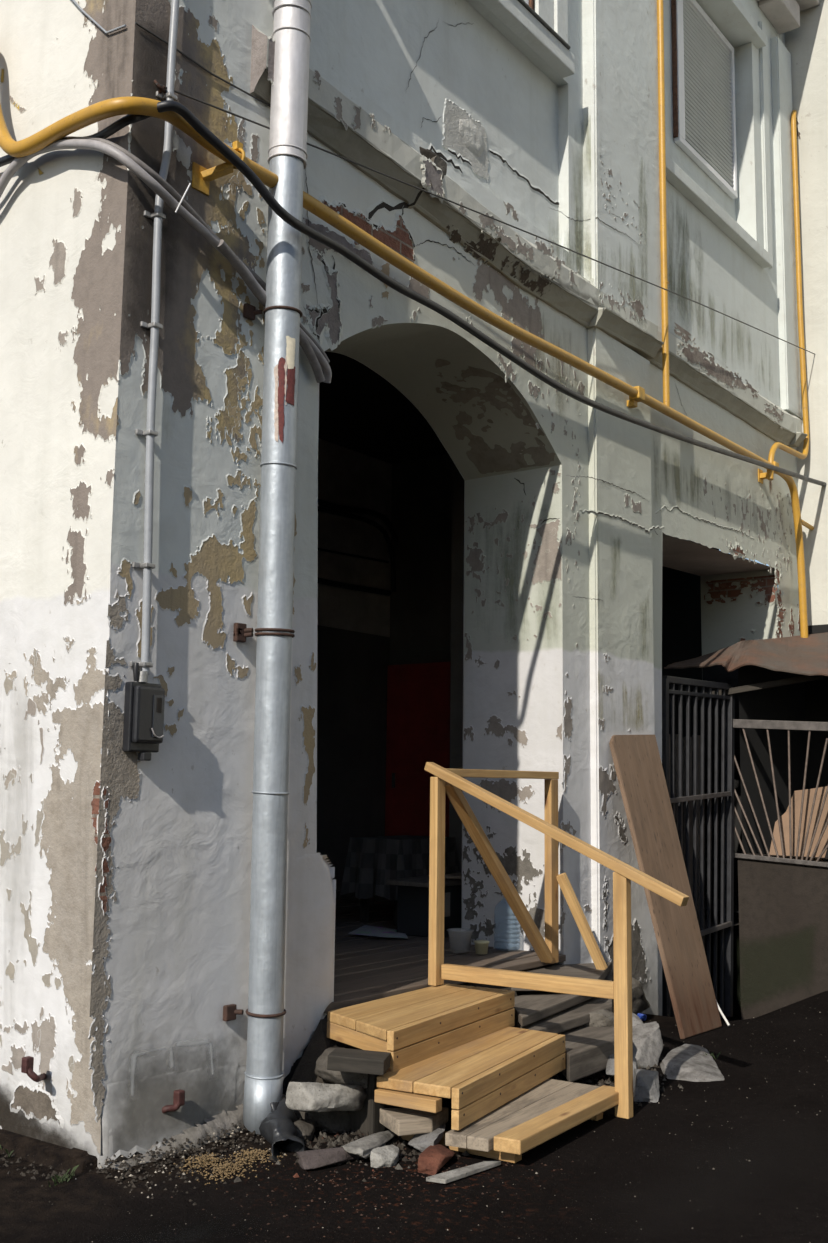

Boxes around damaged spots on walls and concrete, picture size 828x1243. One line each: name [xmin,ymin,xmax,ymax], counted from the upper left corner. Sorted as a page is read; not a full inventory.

peeling [77,0,260,163]
crack [406,21,474,90]
crack [420,116,636,242]
flaking render [301,195,430,351]
peeling [435,201,647,642]
peeling [674,322,784,429]
crack [541,475,754,540]
flaking render [703,477,800,638]
peeling [0,114,265,1156]
peeling [478,778,535,814]
peeling [463,824,566,944]
peeling [631,918,652,984]